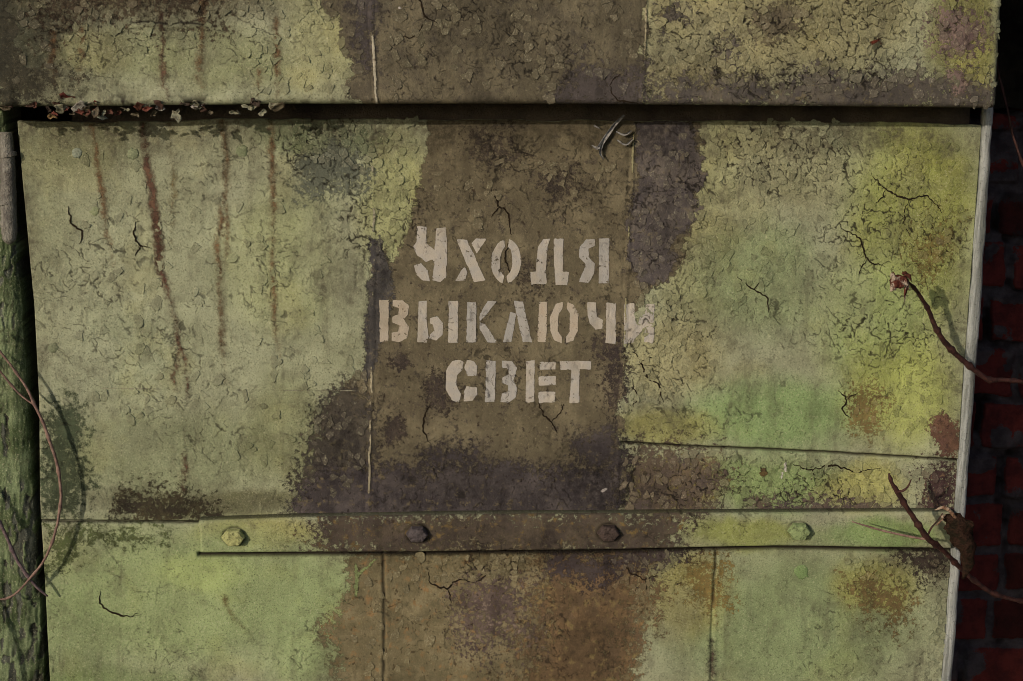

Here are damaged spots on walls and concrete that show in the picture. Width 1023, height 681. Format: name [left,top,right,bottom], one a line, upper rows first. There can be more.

corrosion [0,0,251,107]
peeling [26,92,213,123]
corrosion [139,122,173,303]
corrosion [214,119,230,291]
corrosion [268,119,277,224]
peeling [64,0,1001,510]
crack [843,229,885,274]
crack [871,173,942,238]
water stain [40,388,178,577]
crack [793,464,880,479]
crack [99,593,137,617]
crack [428,572,487,601]